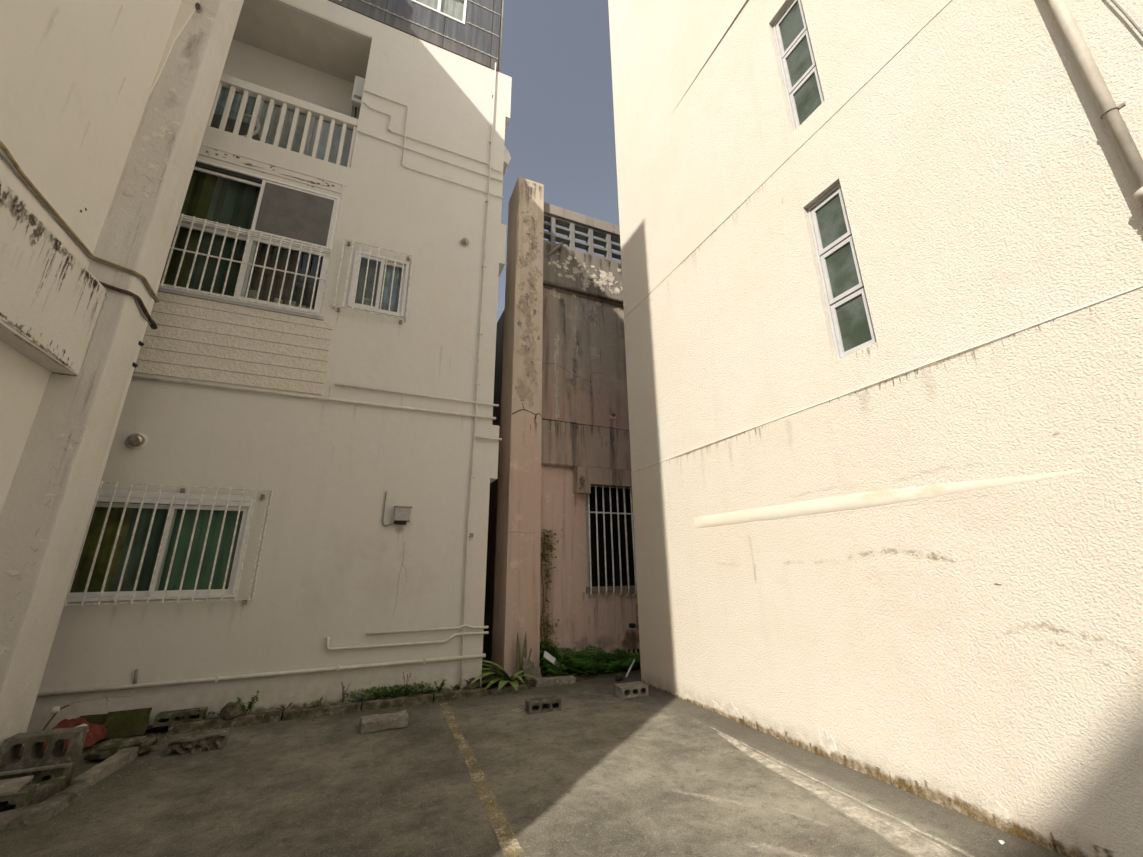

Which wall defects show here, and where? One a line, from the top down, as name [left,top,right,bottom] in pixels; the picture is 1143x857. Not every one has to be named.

damp [0,185,42,245]
damp [46,238,99,306]
peeling [514,211,623,406]
damp [860,345,984,392]
damp [650,685,1110,857]